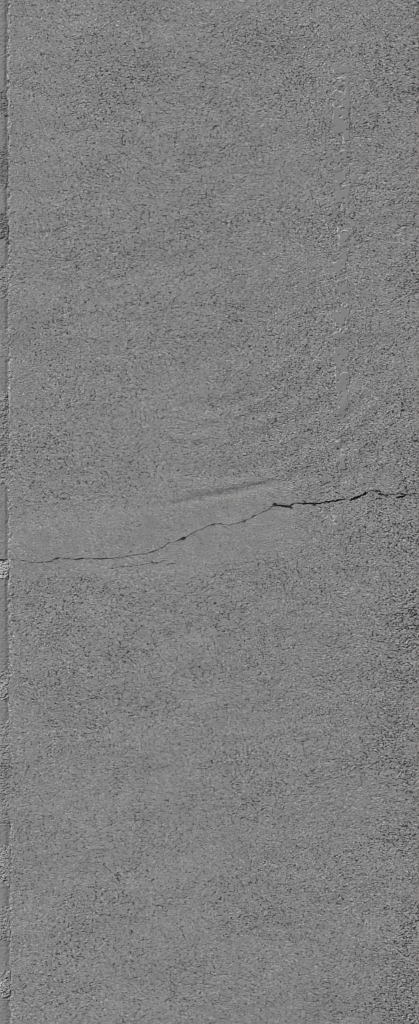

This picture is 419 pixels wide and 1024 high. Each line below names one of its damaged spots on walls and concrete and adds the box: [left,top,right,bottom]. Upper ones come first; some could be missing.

crack [8,490,419,569]